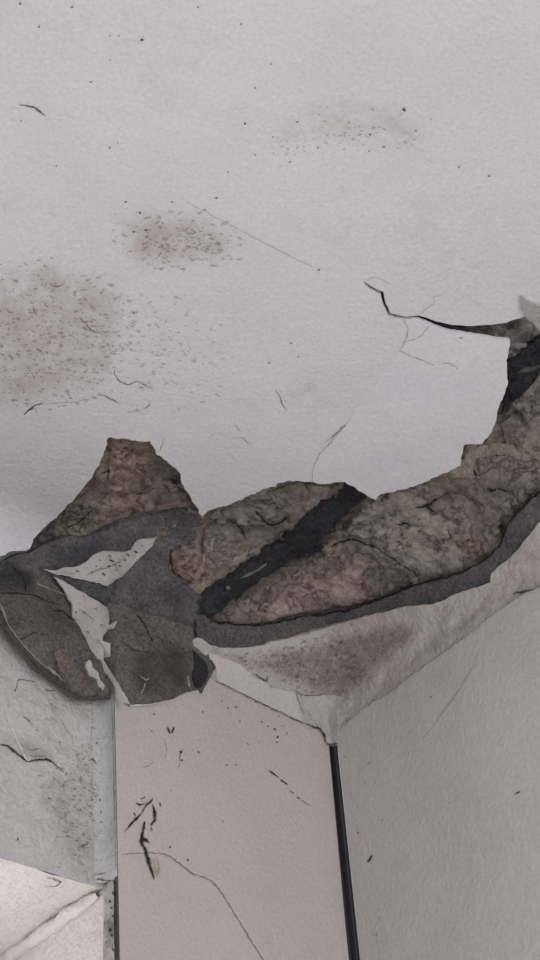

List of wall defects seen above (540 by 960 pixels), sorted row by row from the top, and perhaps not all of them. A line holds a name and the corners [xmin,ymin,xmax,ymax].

crack [377,278,470,367]
spalling [0,296,540,722]
crack [90,701,263,960]